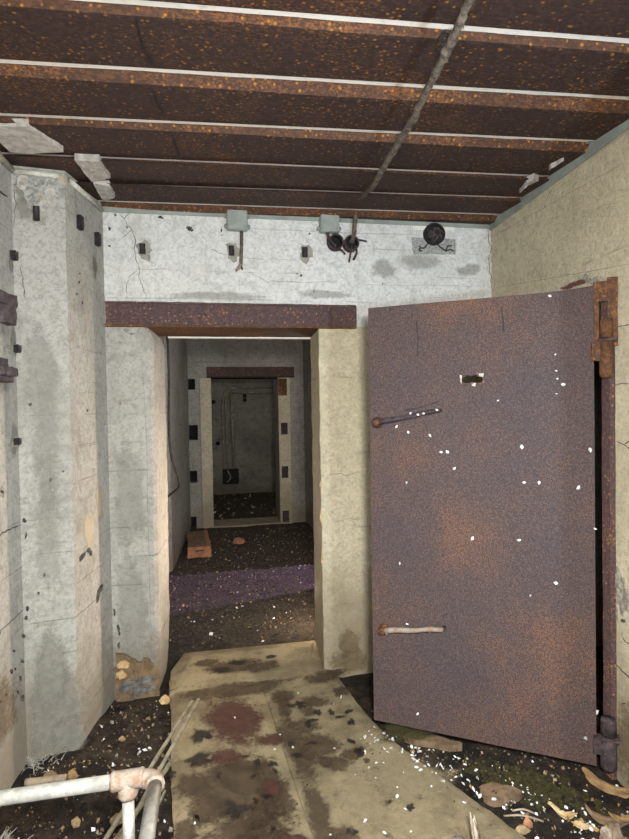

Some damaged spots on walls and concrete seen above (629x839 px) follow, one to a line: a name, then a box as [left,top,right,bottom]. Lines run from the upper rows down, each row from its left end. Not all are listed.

crack [120,215,179,300]
leakage [191,655,279,673]
peeling [116,675,156,701]
leakage [304,669,352,696]
leakage [169,679,454,839]